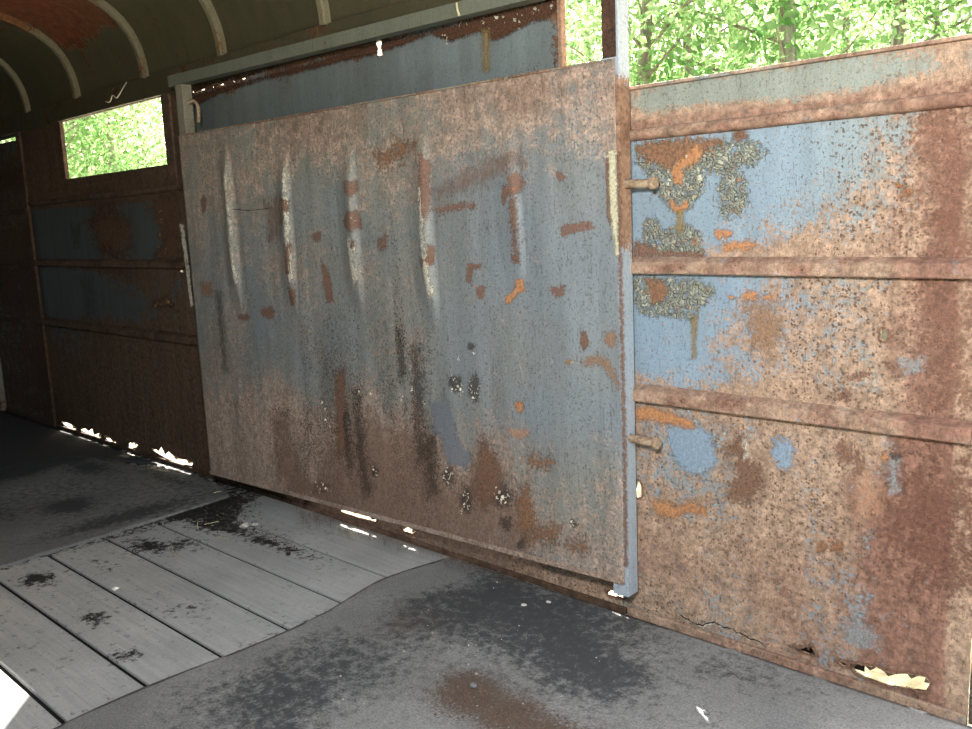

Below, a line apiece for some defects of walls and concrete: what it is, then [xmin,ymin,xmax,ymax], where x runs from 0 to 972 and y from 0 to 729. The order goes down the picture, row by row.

rust [193,0,557,105]
rust [505,278,526,305]
rust [561,221,594,237]
peeling [633,275,715,358]
peeling [634,136,768,254]
rust [715,229,757,252]
rust [891,106,972,258]
rust [903,279,972,421]
rust [392,325,442,502]
rust [473,442,592,557]
rust [872,440,972,622]
crack [678,614,764,646]